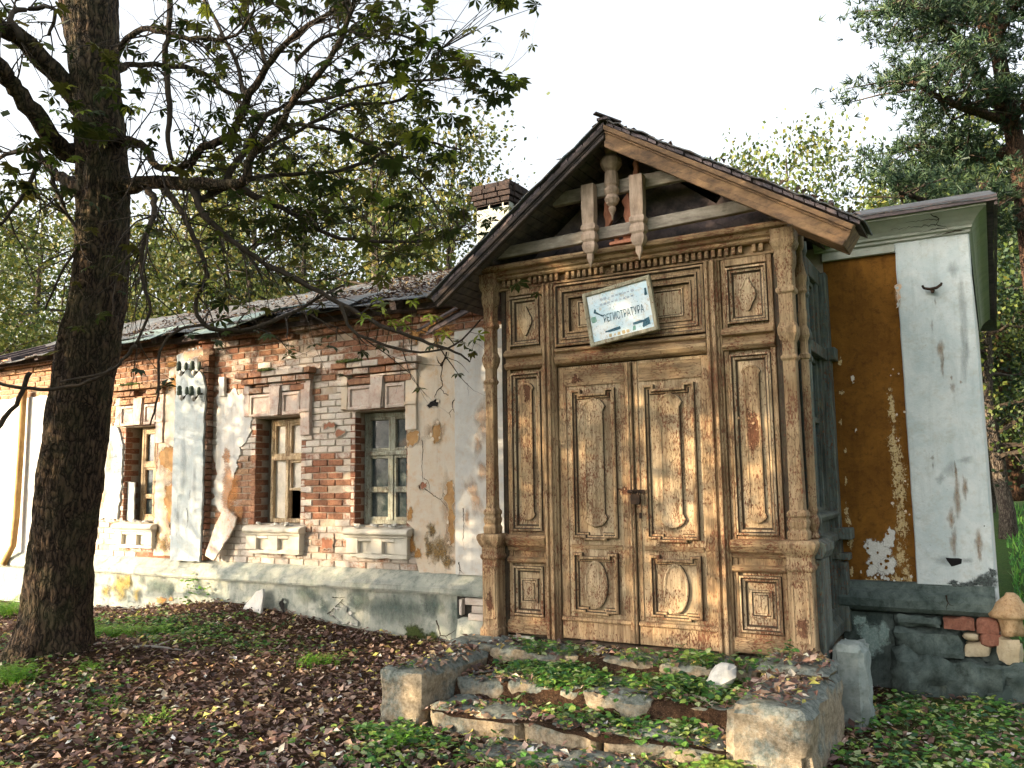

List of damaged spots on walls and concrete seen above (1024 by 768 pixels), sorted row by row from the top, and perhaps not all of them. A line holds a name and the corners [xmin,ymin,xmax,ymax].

spalling [404,397,442,448]
spalling [159,444,173,539]
spalling [441,480,455,546]
peeling [843,368,922,582]